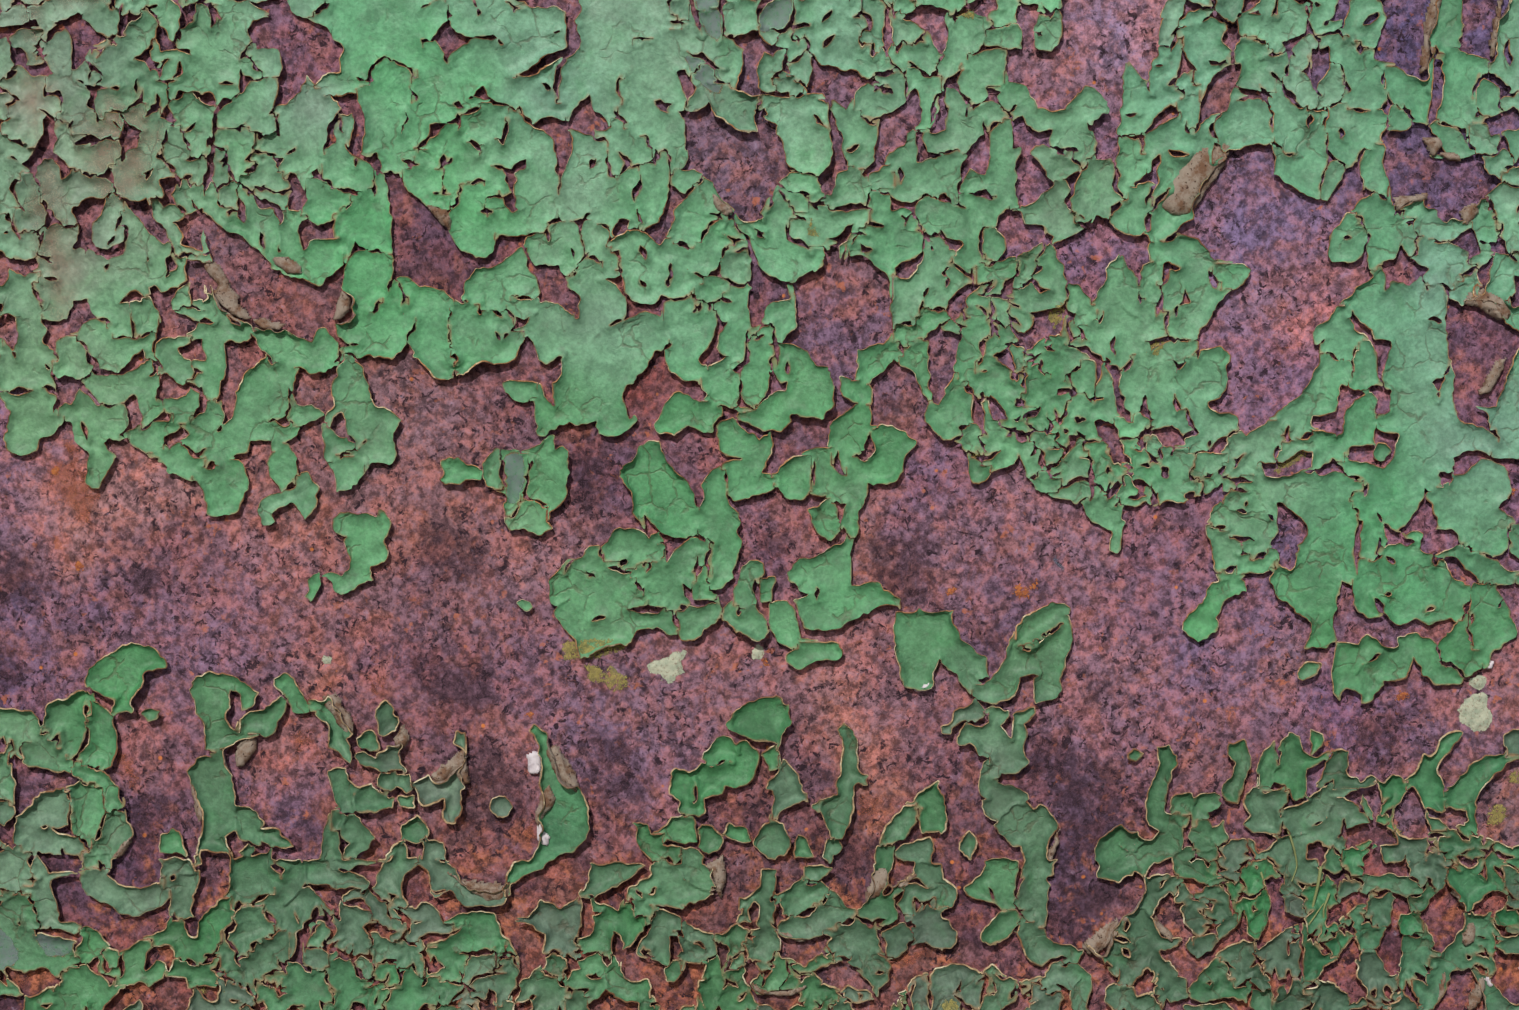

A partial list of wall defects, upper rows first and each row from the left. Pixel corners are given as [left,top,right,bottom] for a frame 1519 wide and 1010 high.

rust [44,173,353,424]
rust [644,183,694,244]
peeling [0,0,1519,704]
rust [890,196,931,278]
rust [1131,156,1160,204]
rust [0,225,1519,1010]
peeling [0,642,958,1010]
peeling [890,602,1519,1010]